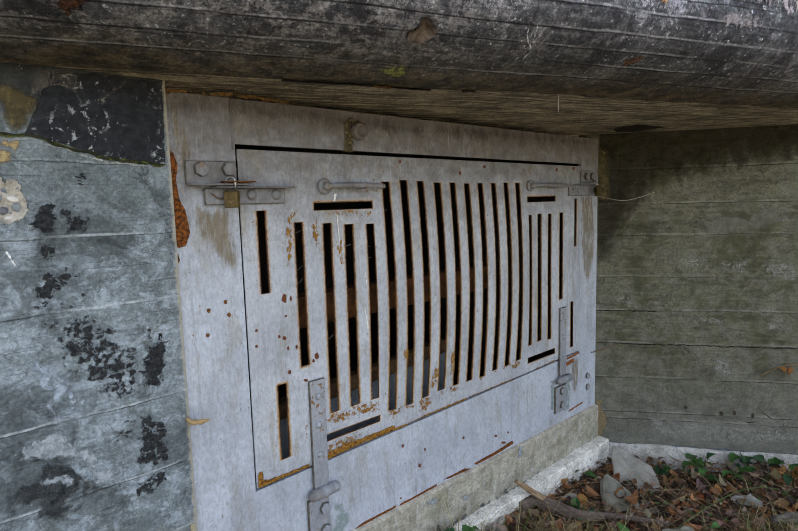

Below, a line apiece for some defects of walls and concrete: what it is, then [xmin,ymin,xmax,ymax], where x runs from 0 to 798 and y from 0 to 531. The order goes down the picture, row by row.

spalling [0,177,89,235]
rust [170,127,190,263]
peeling [39,245,55,260]
rust [198,213,235,266]
peeling [34,267,80,310]
peeling [41,303,168,398]
rust [327,378,515,459]
peeling [116,414,171,496]
rust [258,464,310,488]